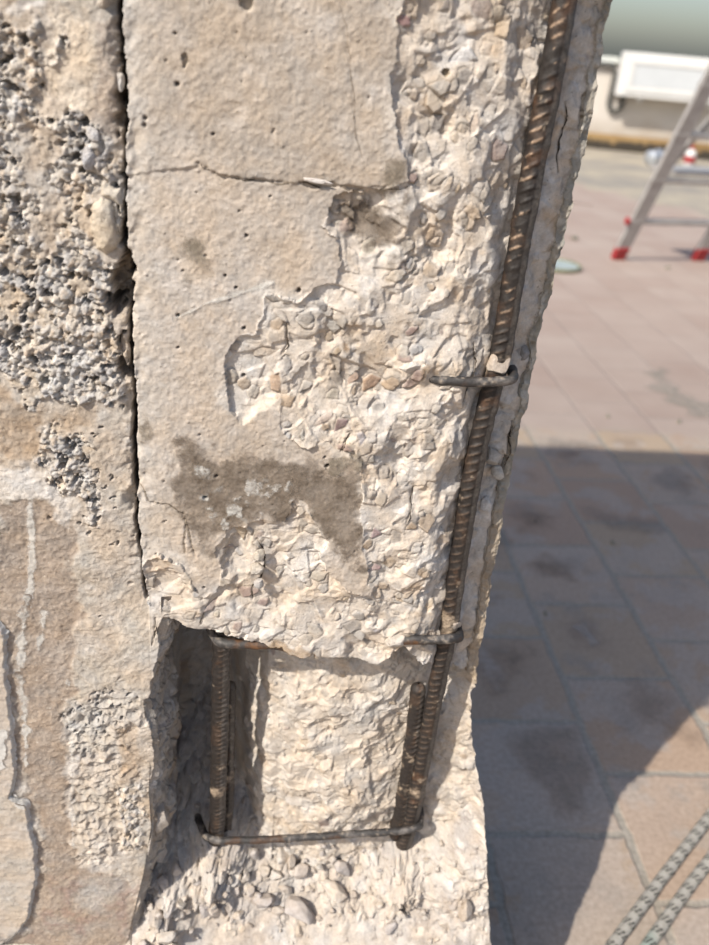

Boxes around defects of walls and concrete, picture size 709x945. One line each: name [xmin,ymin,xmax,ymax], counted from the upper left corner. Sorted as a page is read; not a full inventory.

crack [117,0,130,135]
crack [201,165,408,191]
crack [106,199,194,553]
spalling [142,0,606,868]
water stain [171,438,367,573]